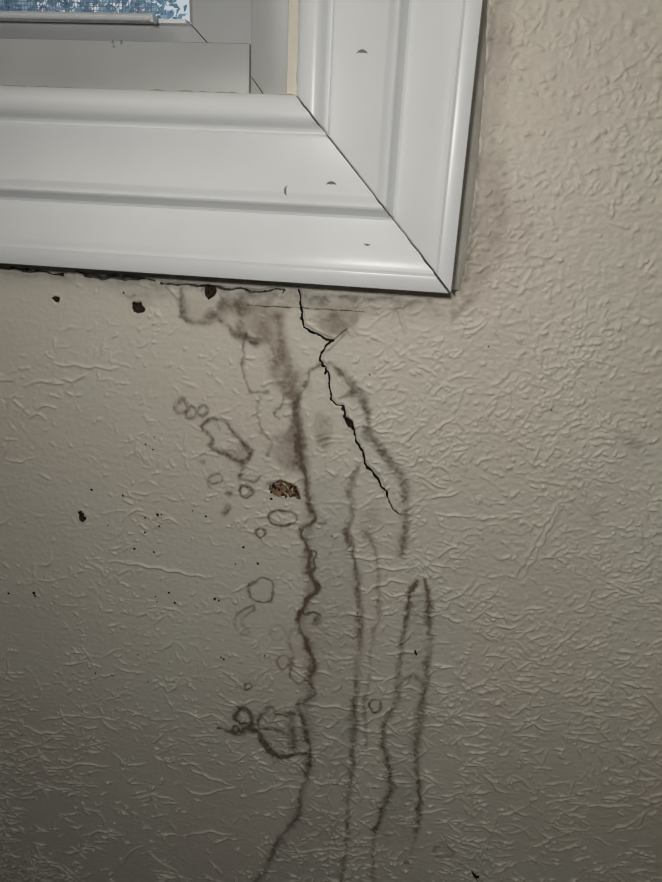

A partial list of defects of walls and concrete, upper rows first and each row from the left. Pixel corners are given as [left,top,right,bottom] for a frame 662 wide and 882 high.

crack [0,267,401,515]
water stain [200,418,249,477]
peeling [269,479,301,500]
water stain [286,373,320,622]
water stain [350,383,397,471]
water stain [343,528,361,634]
water stain [404,579,432,632]
water stain [301,633,316,689]
water stain [217,699,311,767]
water stain [372,715,393,833]